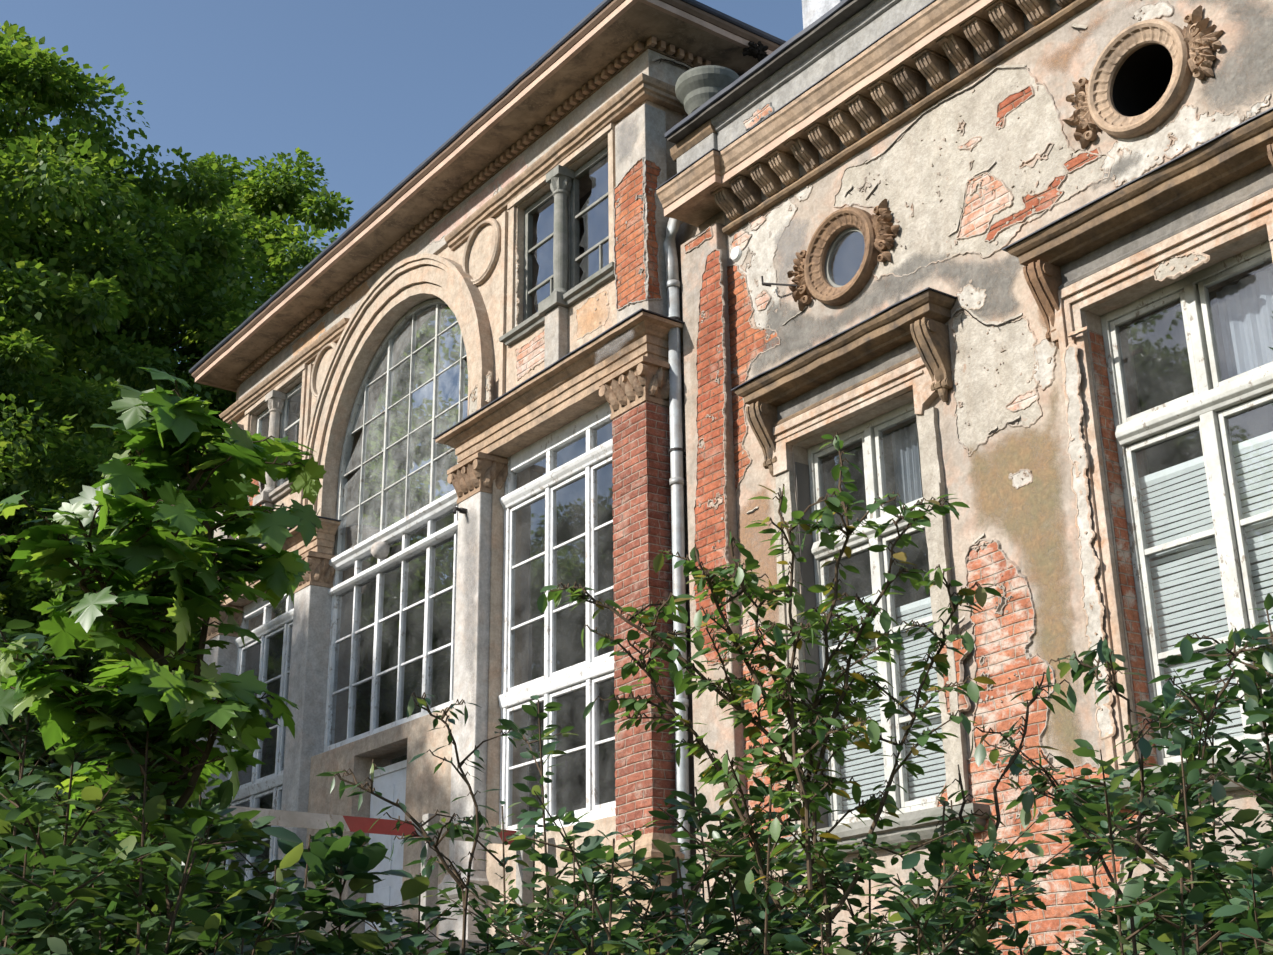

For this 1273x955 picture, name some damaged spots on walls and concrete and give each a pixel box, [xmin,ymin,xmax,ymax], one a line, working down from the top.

flaking render [576,157,662,340]
flaking render [833,66,1272,282]
flaking render [684,185,813,858]
leakage [972,427,1081,763]
flaking render [951,279,1116,741]
flaking render [936,538,1143,955]